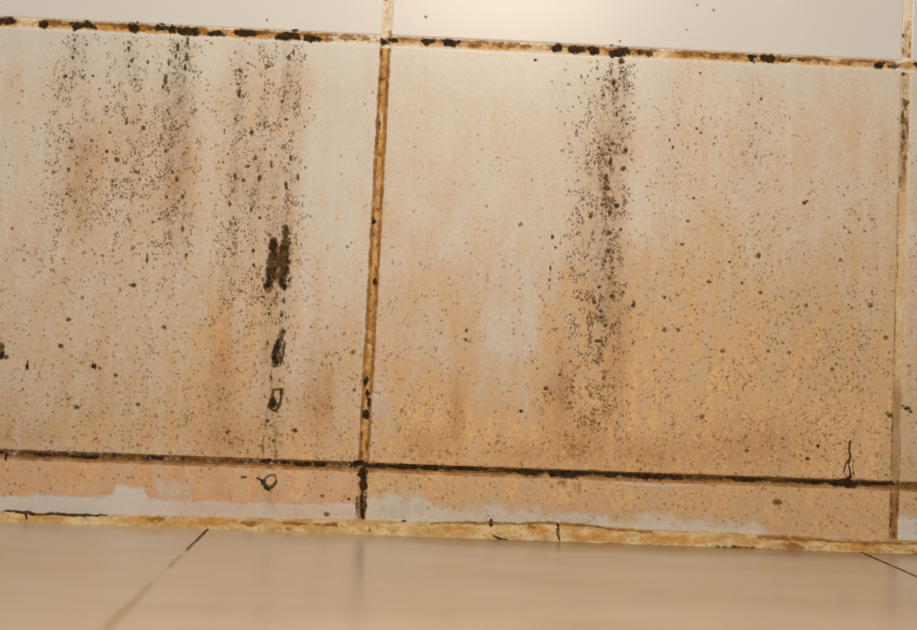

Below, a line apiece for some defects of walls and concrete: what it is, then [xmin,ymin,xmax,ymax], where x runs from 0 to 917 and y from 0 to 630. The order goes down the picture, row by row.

water stain [39,20,106,59]
water stain [113,21,332,99]
water stain [421,38,475,48]
water stain [0,41,917,540]